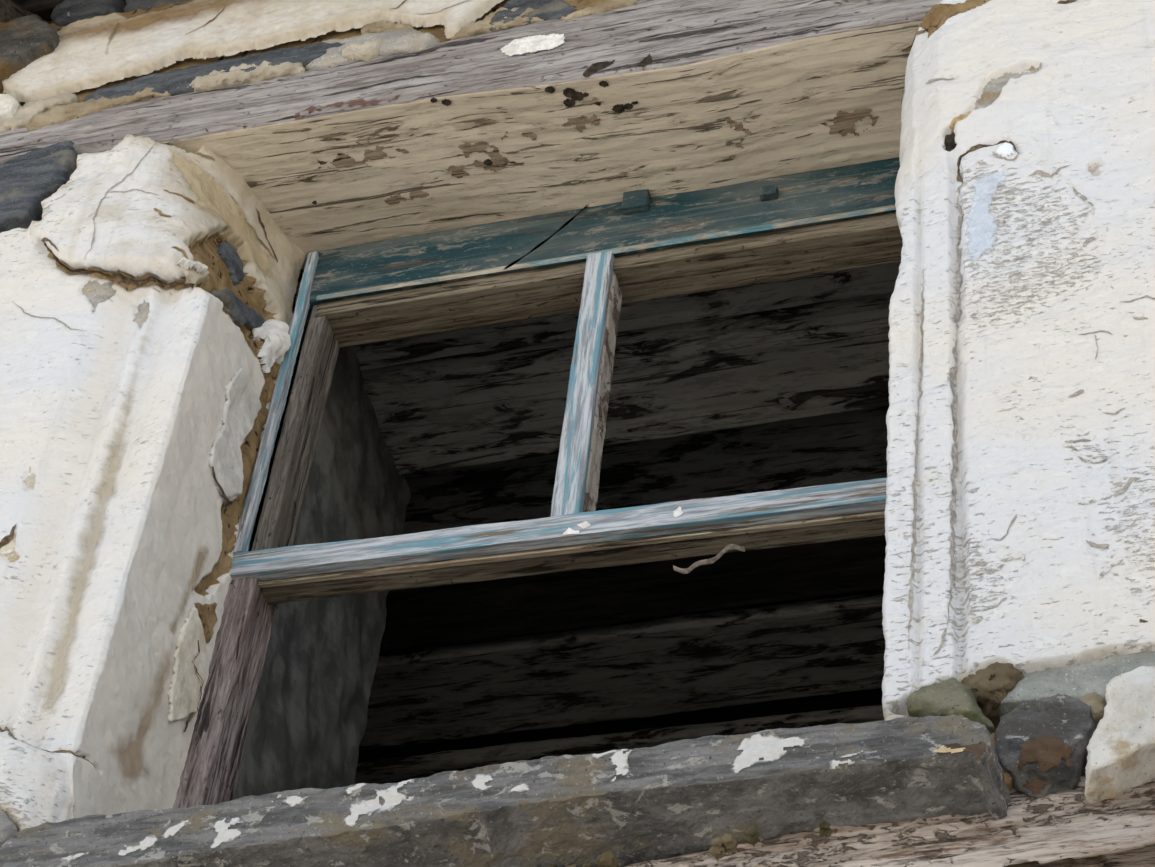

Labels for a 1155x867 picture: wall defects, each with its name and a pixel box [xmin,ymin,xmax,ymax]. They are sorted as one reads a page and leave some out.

peeling [501,33,565,56]
flaking render [909,0,991,54]
flaking render [942,62,1042,152]
crack [41,142,195,291]
flaking render [167,231,291,732]
flaking render [0,524,20,563]
crack [0,727,99,773]